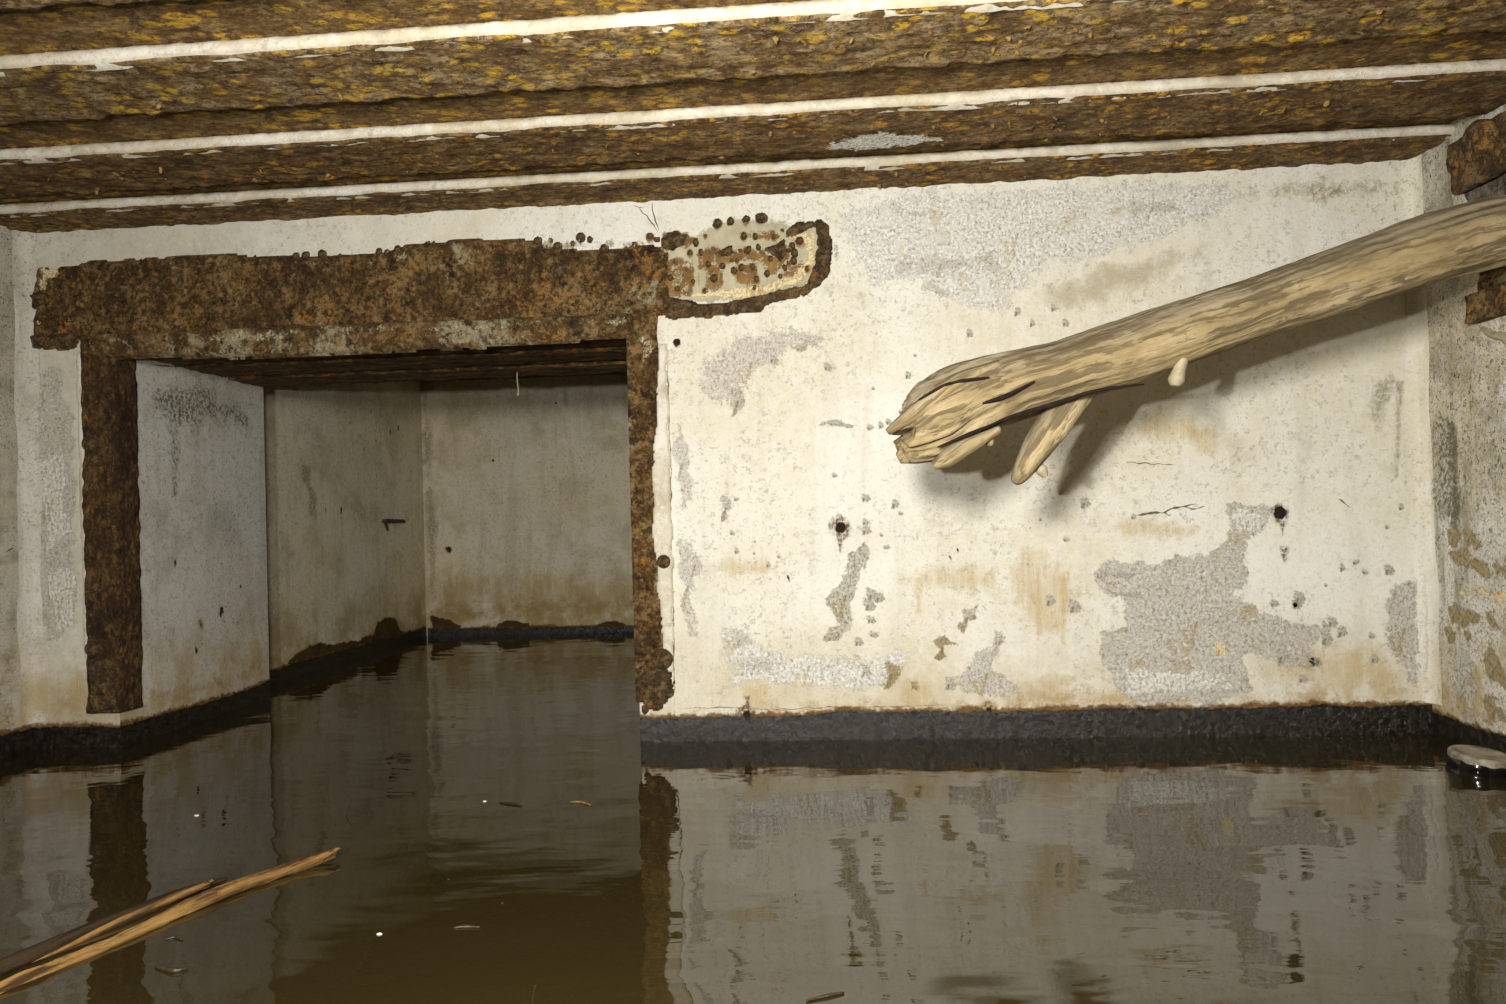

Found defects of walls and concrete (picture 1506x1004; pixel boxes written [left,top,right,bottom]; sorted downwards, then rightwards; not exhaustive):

corrosion [292,245,401,259]
corrosion [533,212,833,320]
corrosion [29,290,48,310]
corrosion [30,332,78,351]
leakage [1432,416,1461,524]
peeling [720,494,1020,697]
peeling [1045,595,1082,614]
peeling [1094,501,1348,703]
peeling [1340,559,1422,687]
corrosion [89,658,117,712]
corrosion [640,669,675,714]
leakage [640,696,1506,754]